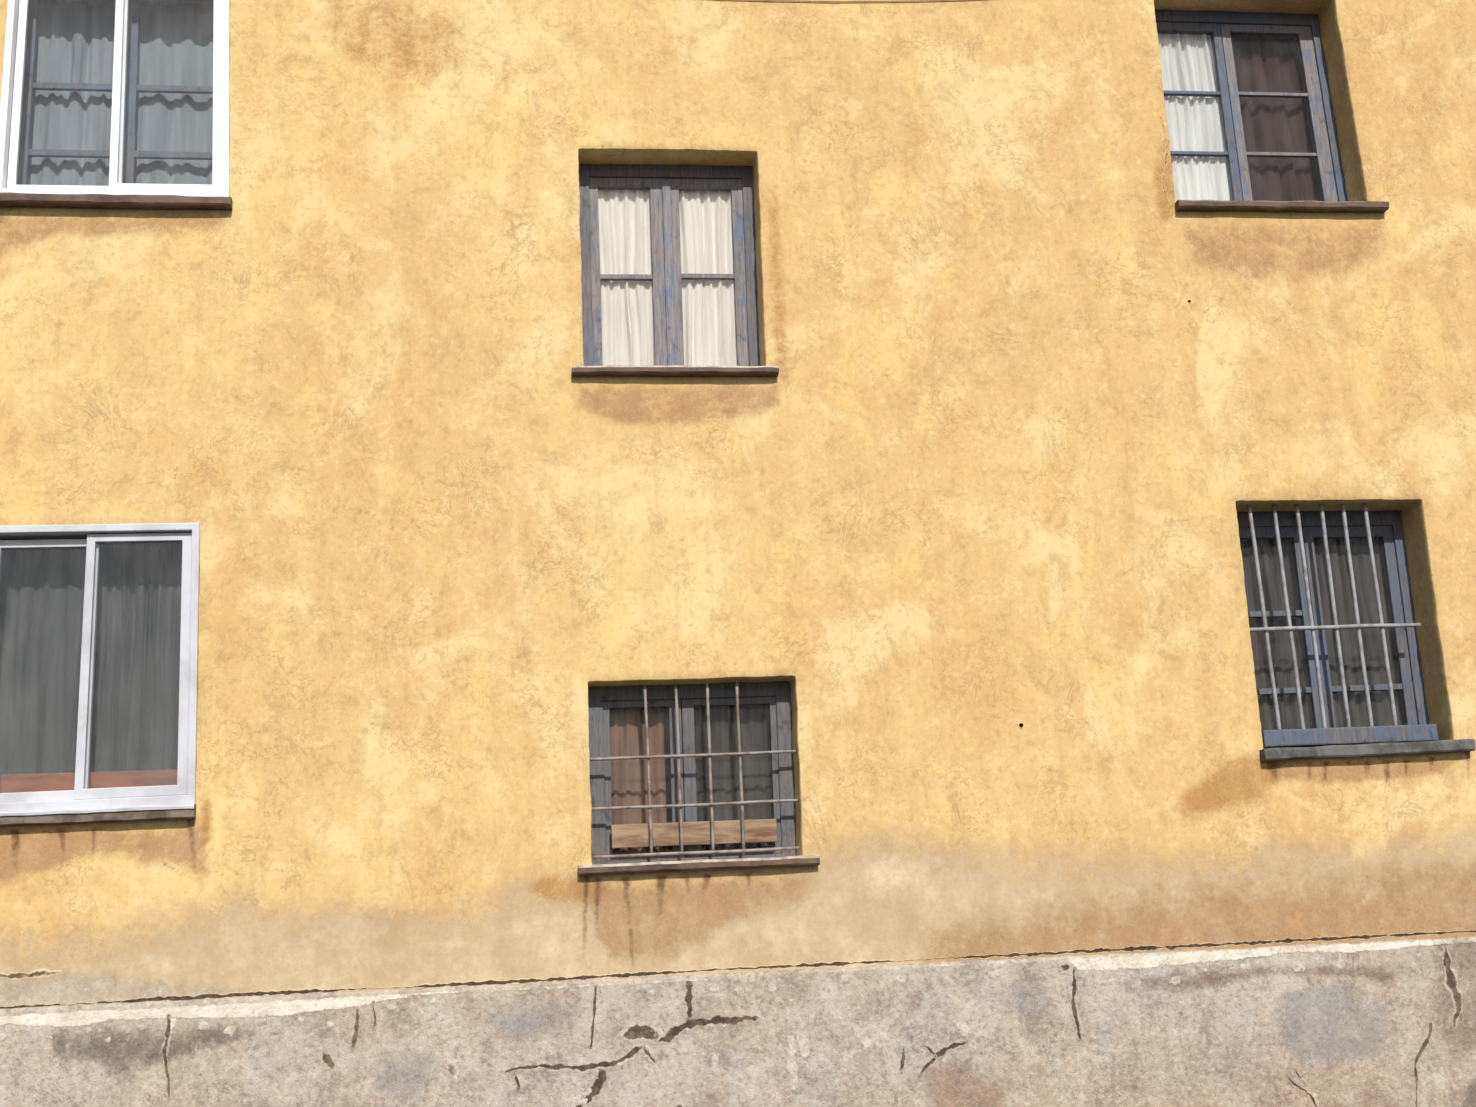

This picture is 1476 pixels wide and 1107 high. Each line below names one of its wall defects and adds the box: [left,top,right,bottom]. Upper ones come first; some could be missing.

leakage [0,819,203,880]
crack [0,967,62,981]
crack [503,981,760,1107]
leakage [0,838,1476,1006]
crack [1411,946,1464,1107]